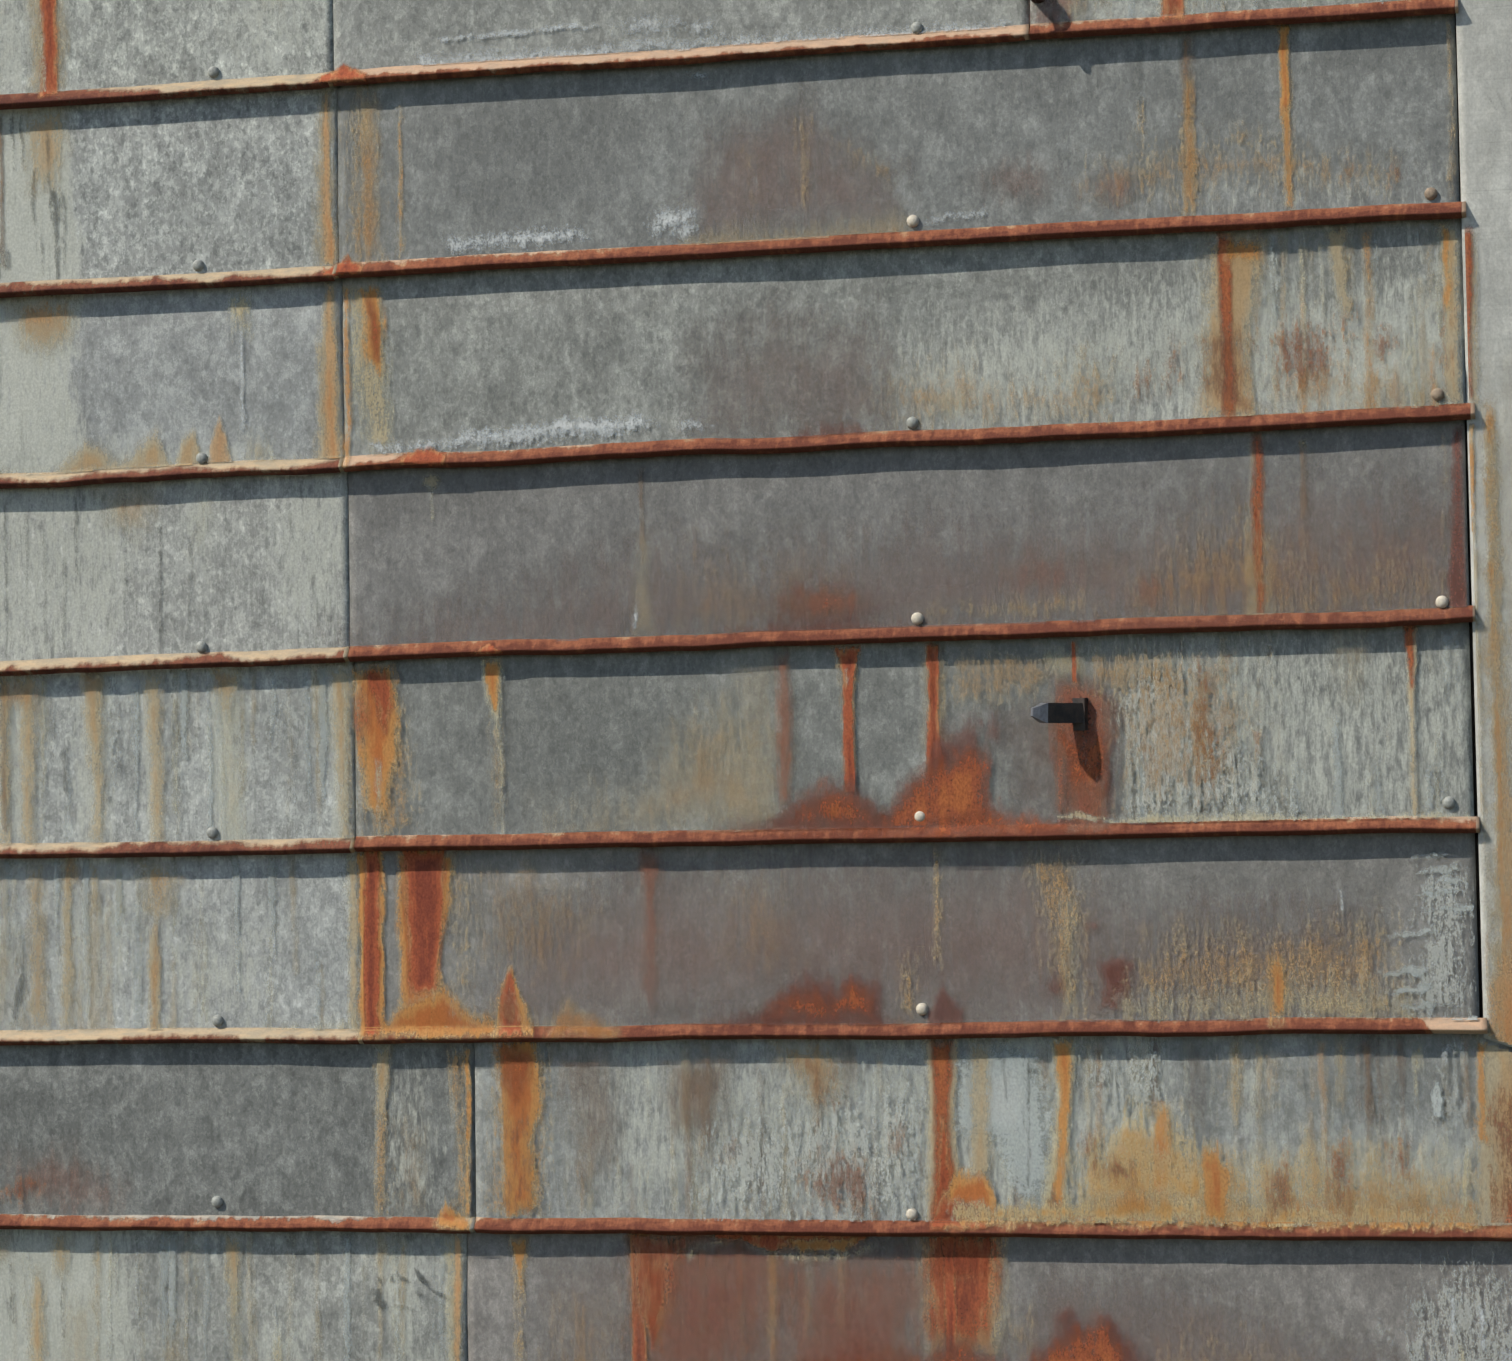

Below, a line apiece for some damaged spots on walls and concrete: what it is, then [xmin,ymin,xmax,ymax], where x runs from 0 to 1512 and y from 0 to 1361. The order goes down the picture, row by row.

corrosion [0,0,1455,205]
corrosion [0,93,1481,815]
corrosion [0,1035,257,1046]
corrosion [0,840,351,859]
corrosion [264,641,1512,1361]
corrosion [1485,467,1512,979]
corrosion [0,1047,472,1361]